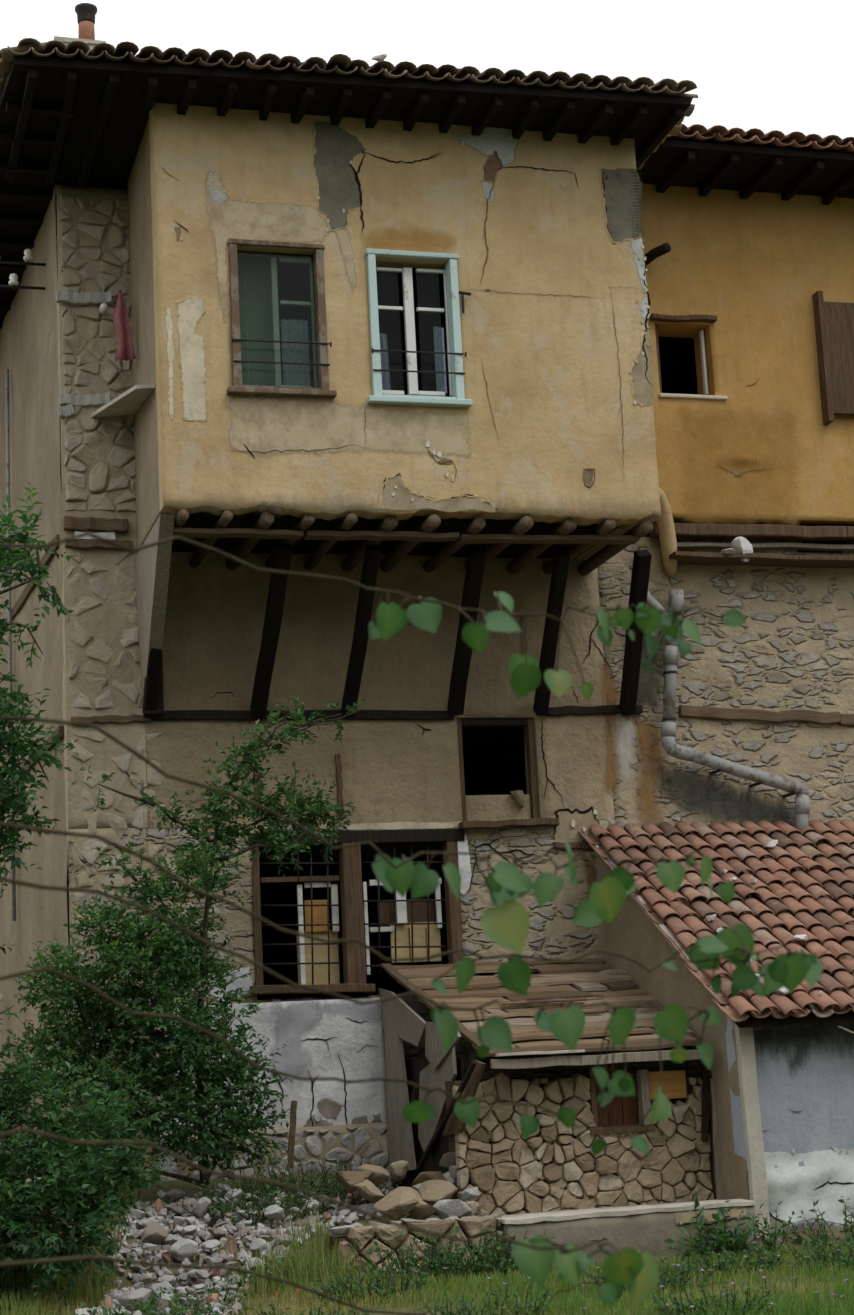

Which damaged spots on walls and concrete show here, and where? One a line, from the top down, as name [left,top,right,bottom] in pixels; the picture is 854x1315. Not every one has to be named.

flaking render [165,121,366,422]
crack [349,150,444,234]
flaking render [455,127,518,202]
crack [468,166,642,479]
flaking render [598,166,653,408]
flaking render [229,397,497,513]